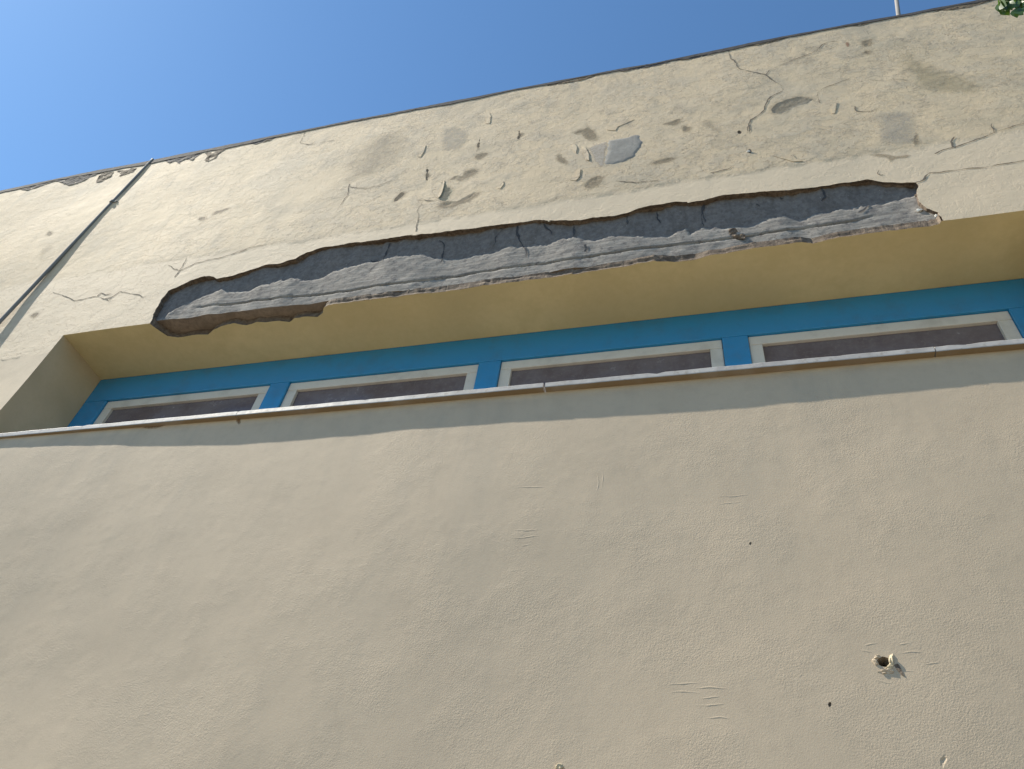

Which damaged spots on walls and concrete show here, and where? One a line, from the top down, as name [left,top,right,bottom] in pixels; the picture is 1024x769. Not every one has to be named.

crack [728,41,831,131]
flaking render [771,97,814,114]
flaking render [166,149,225,163]
peeling [557,118,642,164]
crack [917,123,1024,182]
flaking render [21,168,137,190]
flaking render [584,176,603,189]
crack [169,244,265,276]
spalling [150,179,943,337]
crack [53,291,149,301]
flaking render [872,653,904,676]